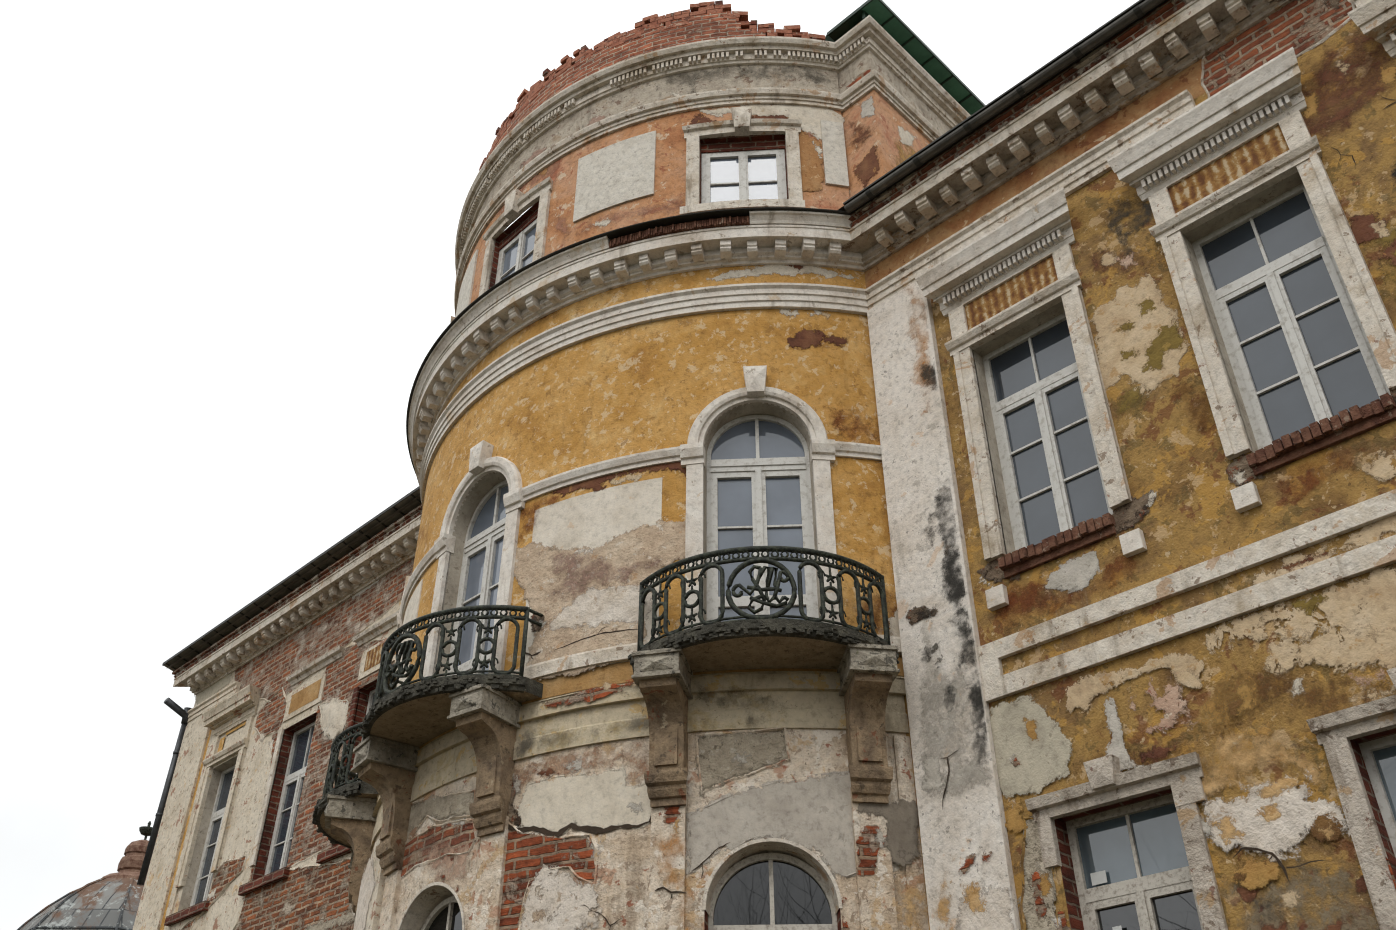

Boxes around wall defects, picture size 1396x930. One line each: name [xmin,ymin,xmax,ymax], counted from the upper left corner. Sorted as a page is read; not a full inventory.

spalling [1201,0,1396,137]
leakage [921,365,937,387]
peeling [1089,249,1191,414]
peeling [514,519,686,707]
spalling [888,593,938,637]
leakage [926,488,974,666]
spalling [179,557,481,930]
spalling [499,727,791,930]
spalling [805,825,885,880]
crack [940,750,958,810]
leakage [945,686,987,763]
peeling [903,567,1396,930]